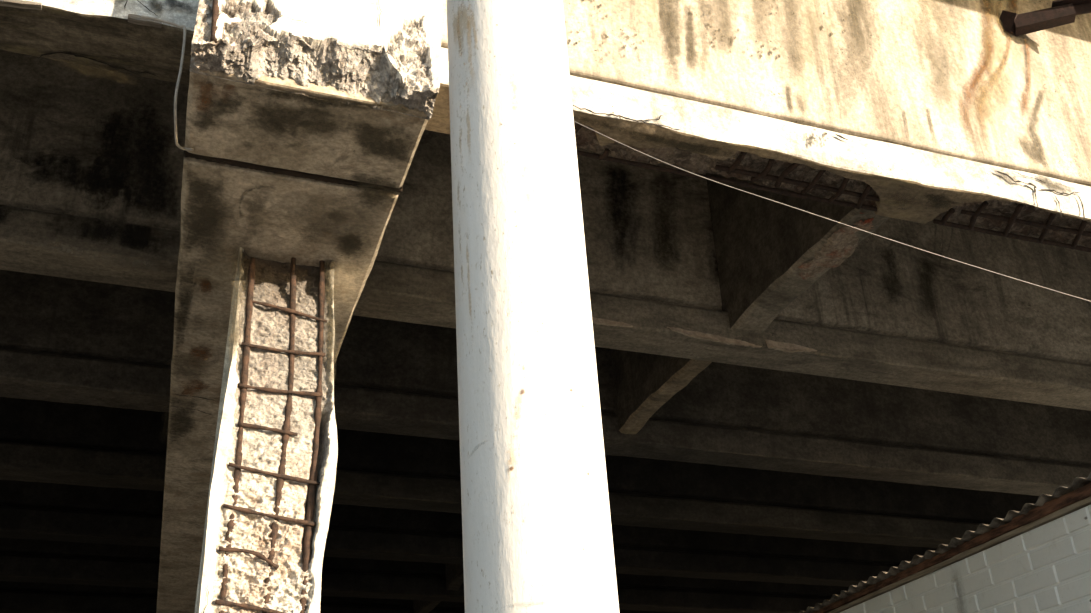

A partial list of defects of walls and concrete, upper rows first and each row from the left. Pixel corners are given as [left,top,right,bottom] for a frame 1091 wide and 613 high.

water stain [26,108,224,251]
spalling [168,0,439,120]
water stain [252,92,382,135]
water stain [355,123,410,162]
water stain [660,0,747,89]
spalling [574,122,880,279]
rust [961,0,1017,120]
spalling [933,199,1091,253]
rust [1023,40,1031,108]
water stain [1000,76,1070,189]
crack [997,171,1085,219]
spalling [210,250,333,613]